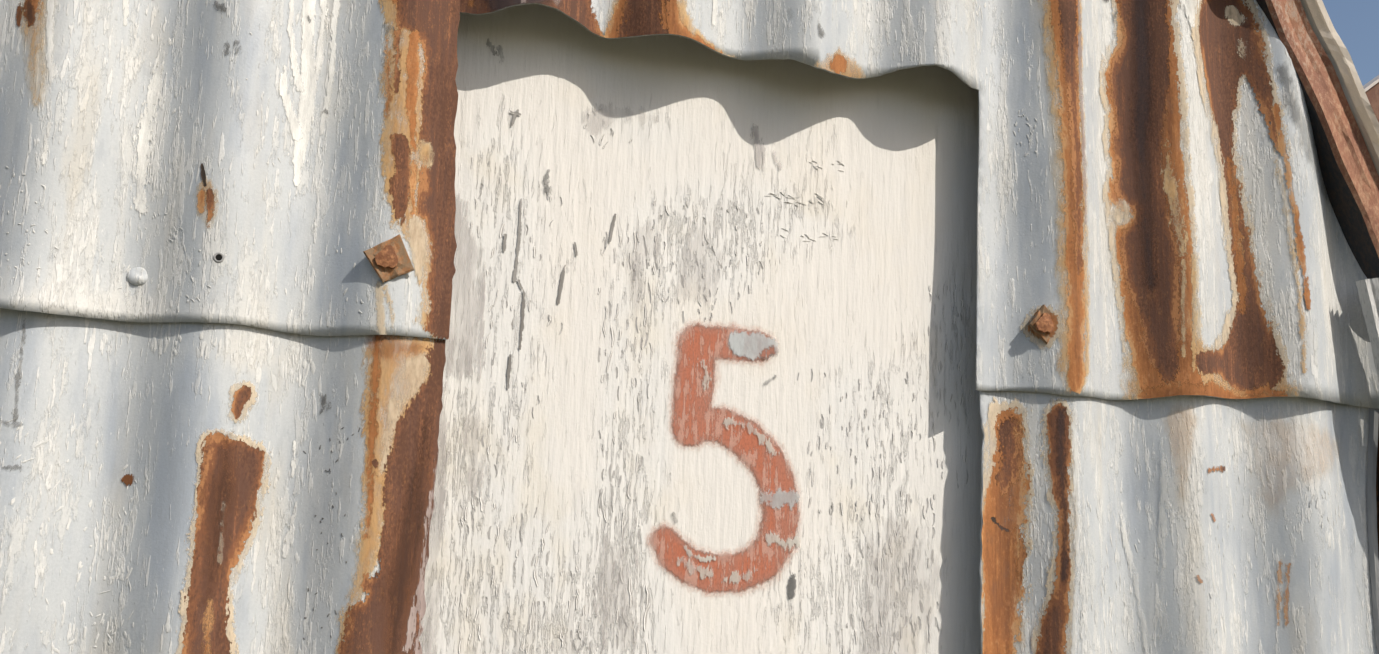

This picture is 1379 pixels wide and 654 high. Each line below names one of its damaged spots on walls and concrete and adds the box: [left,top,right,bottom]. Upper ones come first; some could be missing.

corrosion [16,0,48,101]
corrosion [197,163,215,222]
corrosion [175,381,272,654]
peeling [454,202,468,234]
corrosion [336,0,730,654]
peeling [455,430,651,654]
peeling [598,200,763,419]
peeling [677,545,740,584]
peeling [724,417,777,456]
peeling [808,339,972,654]
corrosion [981,0,1311,654]